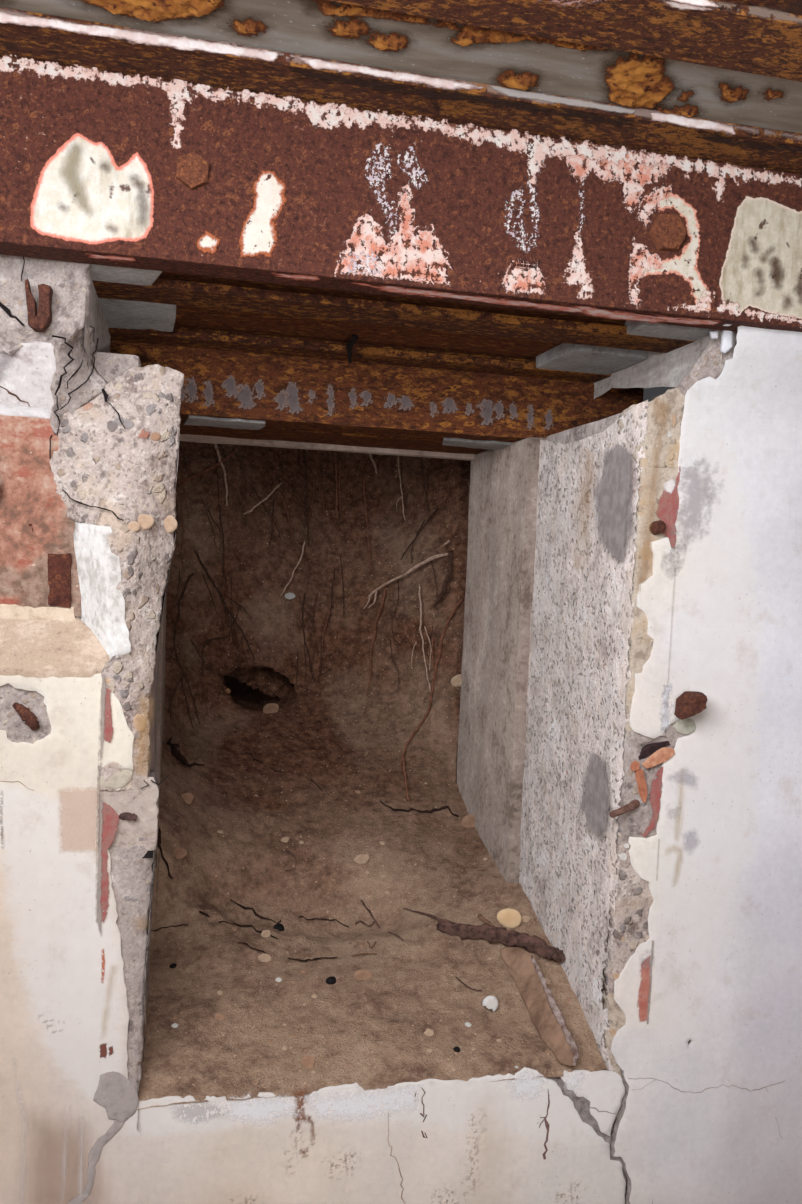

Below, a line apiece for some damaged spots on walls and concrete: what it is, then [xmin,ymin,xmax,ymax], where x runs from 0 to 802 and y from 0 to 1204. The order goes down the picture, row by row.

corrosion [81,0,267,37]
corrosion [307,0,699,117]
corrosion [63,147,86,208]
peeling [0,54,802,328]
crack [0,302,24,326]
crack [0,335,126,459]
peeling [429,397,554,430]
spalling [0,133,414,1094]
corrosion [638,741,670,760]
spalling [601,329,737,1078]
crack [66,1071,139,1204]
crack [539,1069,785,1204]